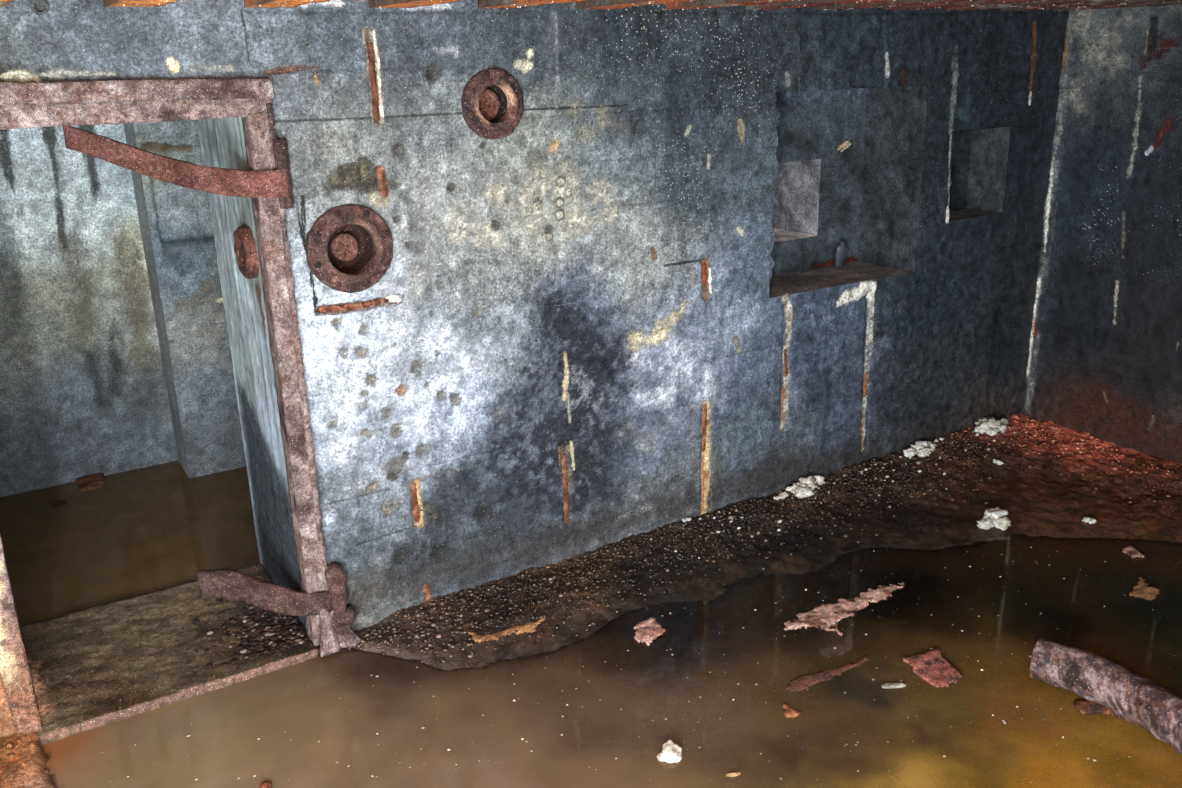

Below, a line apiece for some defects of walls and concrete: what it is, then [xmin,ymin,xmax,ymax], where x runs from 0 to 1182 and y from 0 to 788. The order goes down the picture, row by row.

water stain [1144,4,1182,61]
water stain [1127,75,1142,178]
water stain [1025,9,1131,413]
efflorescence [626,301,719,408]
corrosion [700,400,725,516]
water stain [343,445,882,608]
corrosion [0,674,12,730]